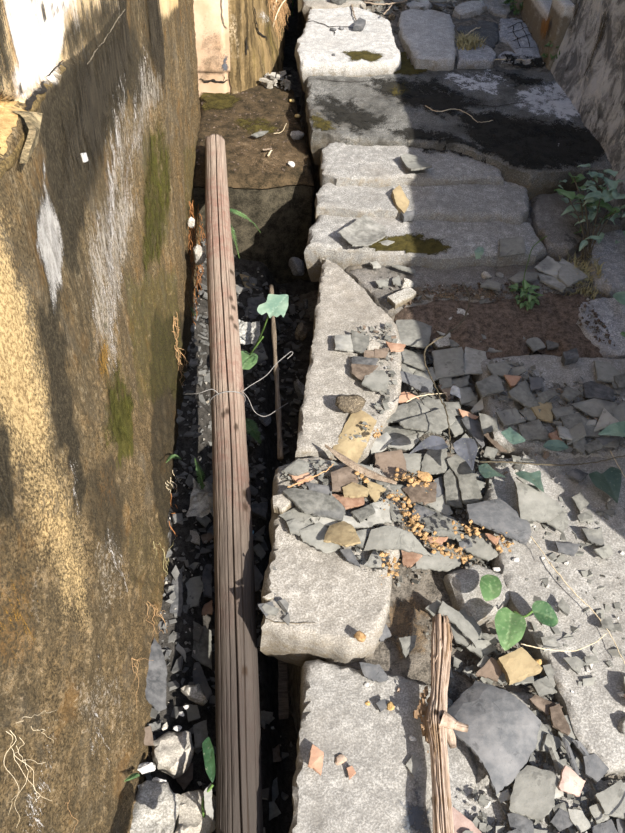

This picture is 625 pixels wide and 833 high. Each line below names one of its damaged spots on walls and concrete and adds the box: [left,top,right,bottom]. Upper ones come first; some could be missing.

damp [0,0,15,101]
peeling [0,0,76,179]
damp [37,185,63,305]